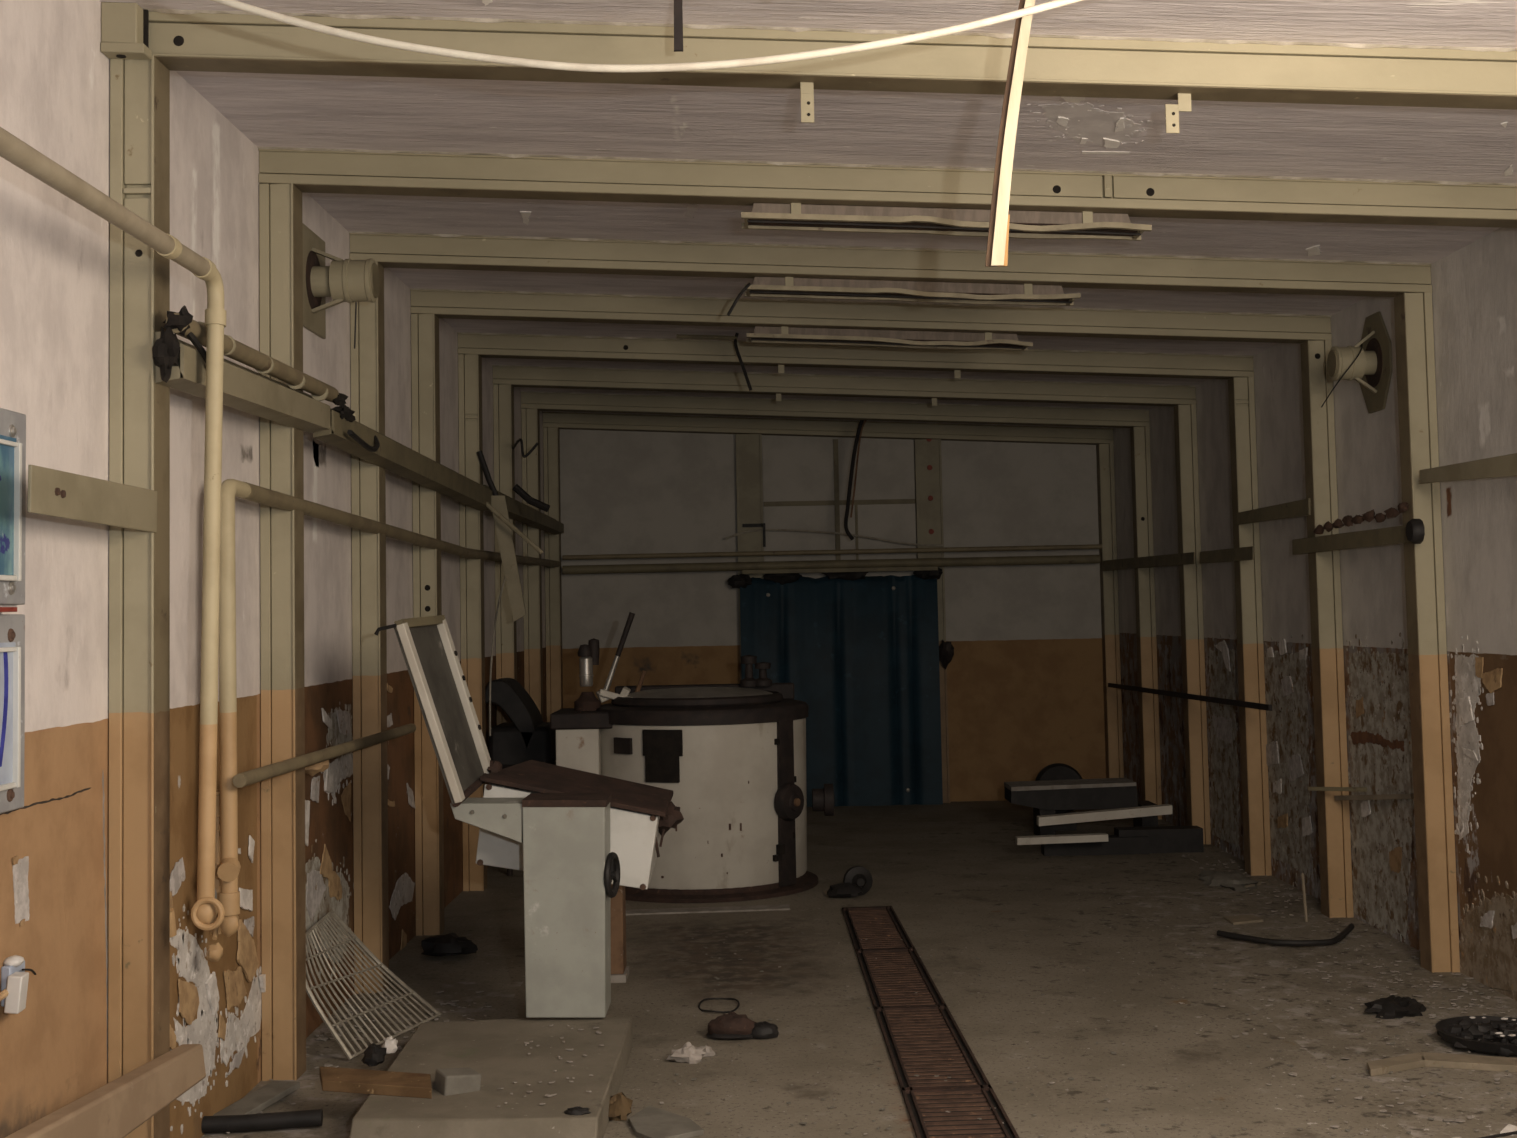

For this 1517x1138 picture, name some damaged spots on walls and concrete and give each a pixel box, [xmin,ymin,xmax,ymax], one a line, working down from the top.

peeling [12,856,30,926]
crack [0,772,108,1066]
peeling [170,857,266,1134]
peeling [238,835,255,863]
peeling [305,703,354,977]
peeling [1345,632,1416,946]
peeling [1447,635,1503,854]
flaking render [1459,872,1517,1001]